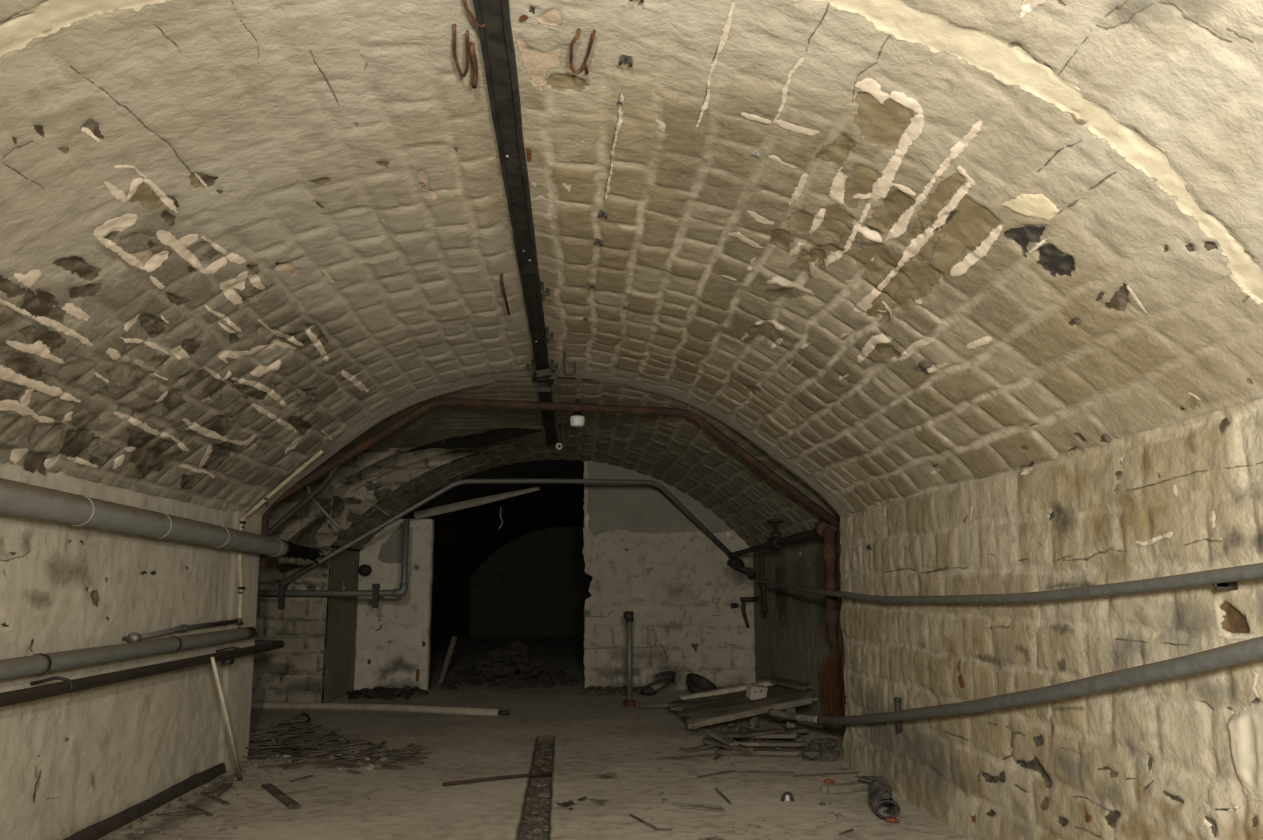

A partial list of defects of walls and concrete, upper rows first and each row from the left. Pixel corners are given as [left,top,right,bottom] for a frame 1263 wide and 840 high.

peeling [0,0,171,57]
peeling [519,6,563,27]
peeling [516,37,588,91]
crack [695,42,720,126]
peeling [80,119,104,142]
peeling [793,0,1263,305]
peeling [719,78,1075,376]
peeling [0,164,333,490]
spalling [1095,283,1148,314]
peeling [341,370,369,393]
spalling [1217,601,1255,640]
rust [819,651,843,728]